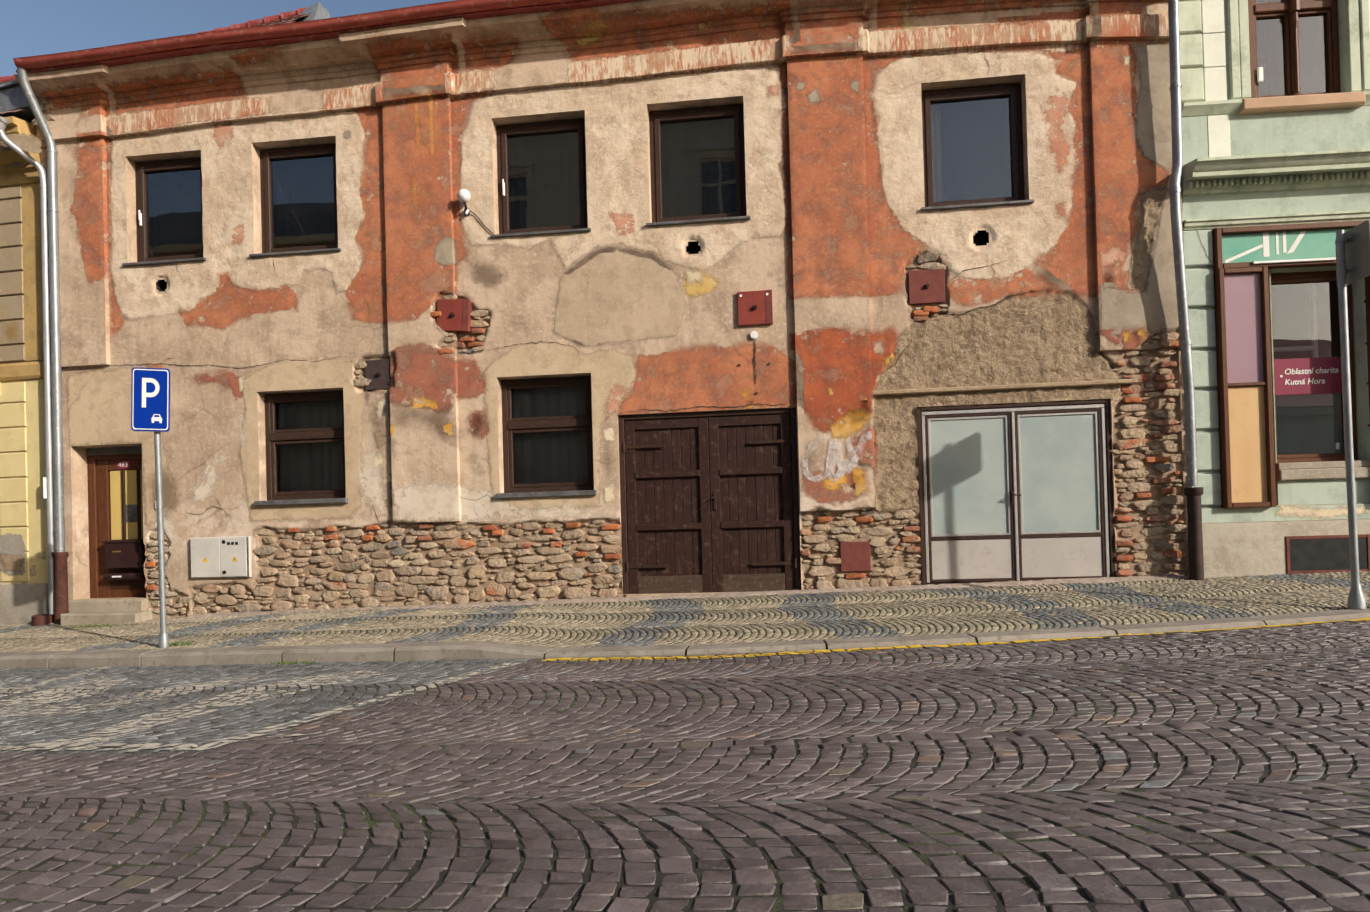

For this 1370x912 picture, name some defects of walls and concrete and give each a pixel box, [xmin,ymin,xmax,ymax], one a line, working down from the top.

peeling [0,46,298,332]
peeling [343,34,519,439]
peeling [541,0,1188,589]
spalling [0,534,45,582]
peeling [373,424,395,468]